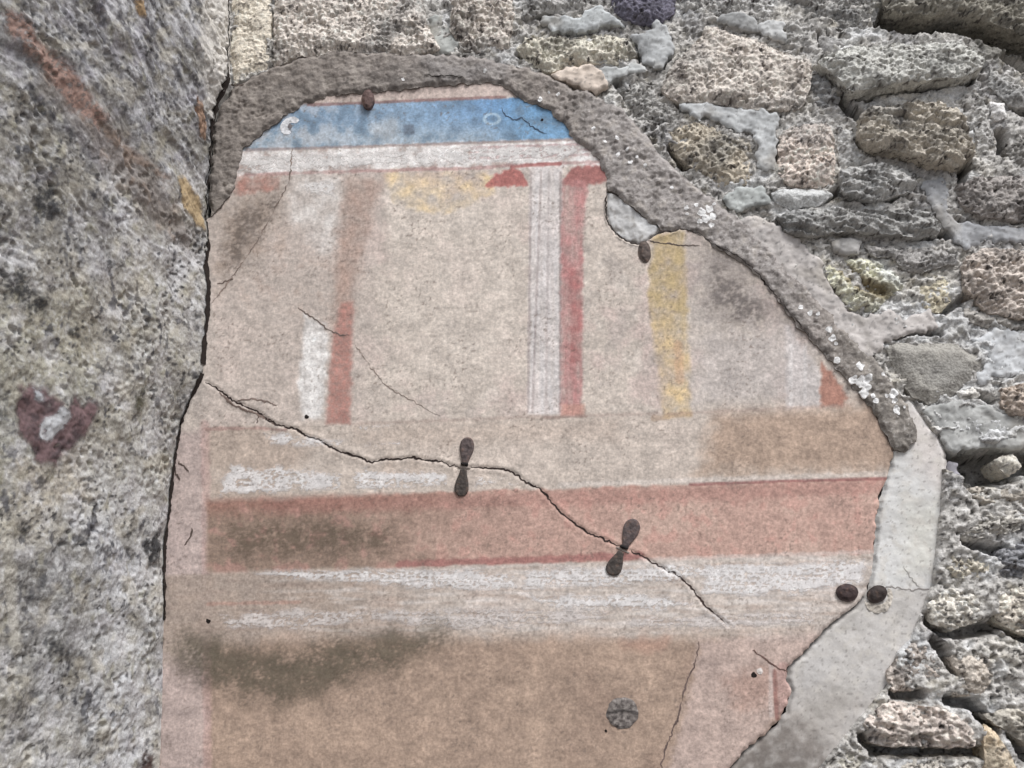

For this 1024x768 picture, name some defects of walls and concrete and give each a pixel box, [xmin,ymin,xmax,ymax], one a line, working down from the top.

crack [163,0,725,623]
water stain [188,633,435,697]
crack [660,642,699,768]